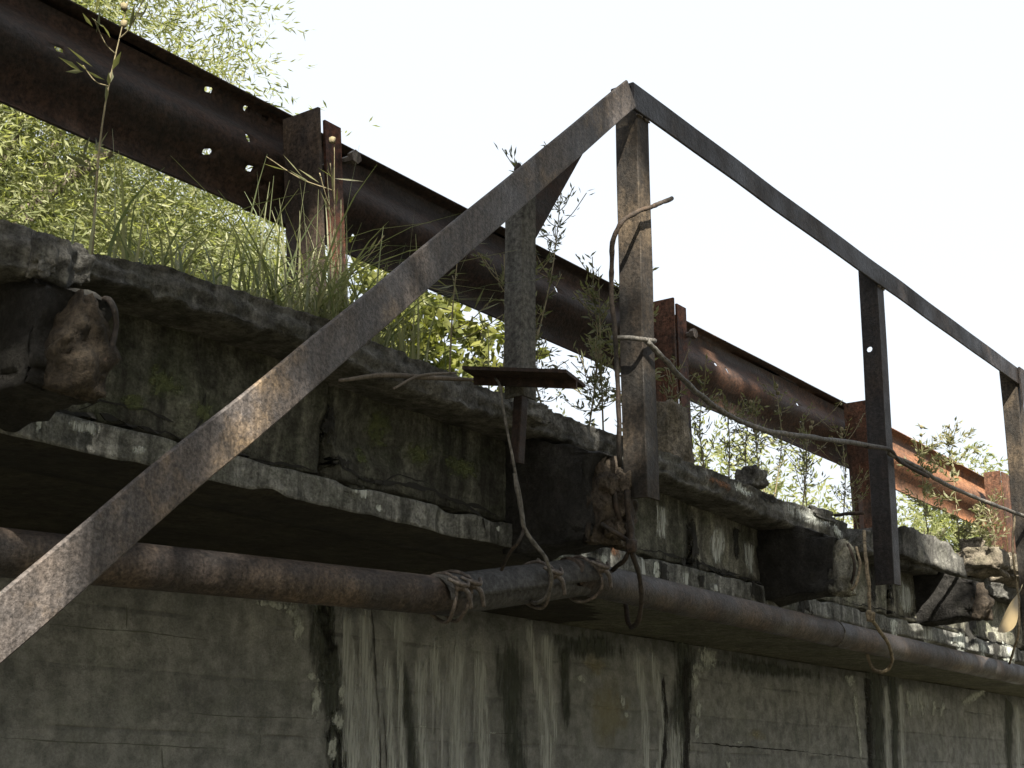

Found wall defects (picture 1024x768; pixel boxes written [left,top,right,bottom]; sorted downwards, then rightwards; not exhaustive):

leakage [308,604,696,768]